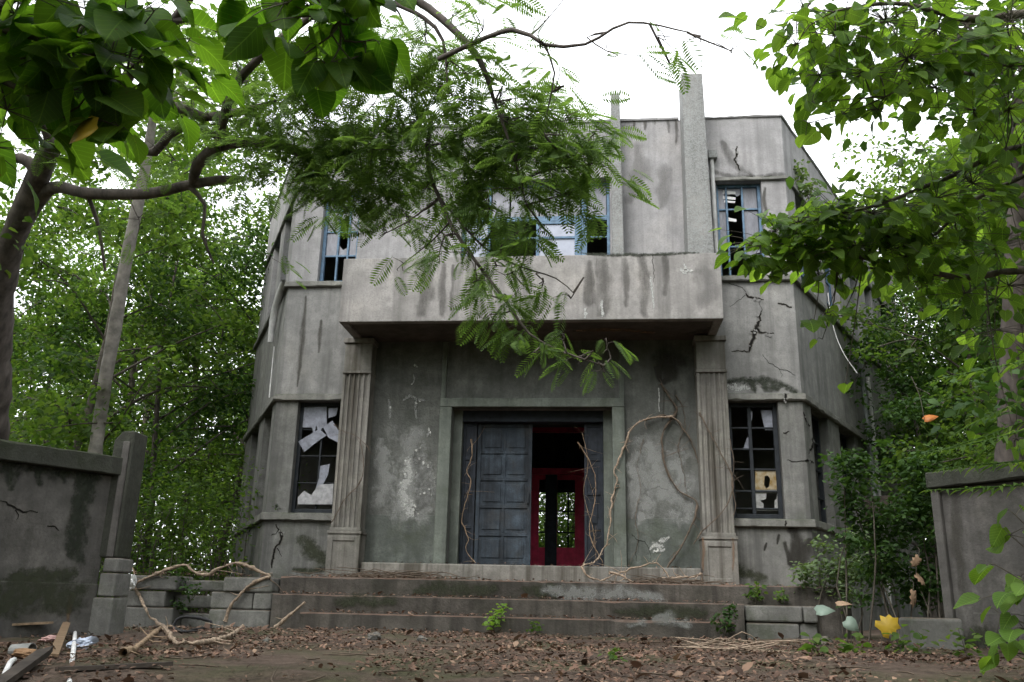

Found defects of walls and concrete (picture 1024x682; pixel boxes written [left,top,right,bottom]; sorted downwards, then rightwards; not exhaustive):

crack [733,146,771,177]
water stain [580,252,696,318]
water stain [297,297,306,386]
water stain [727,377,797,393]
crack [729,283,814,465]
crack [0,500,60,532]
water stain [0,461,101,563]
crack [271,524,284,568]
peeling [397,443,437,518]